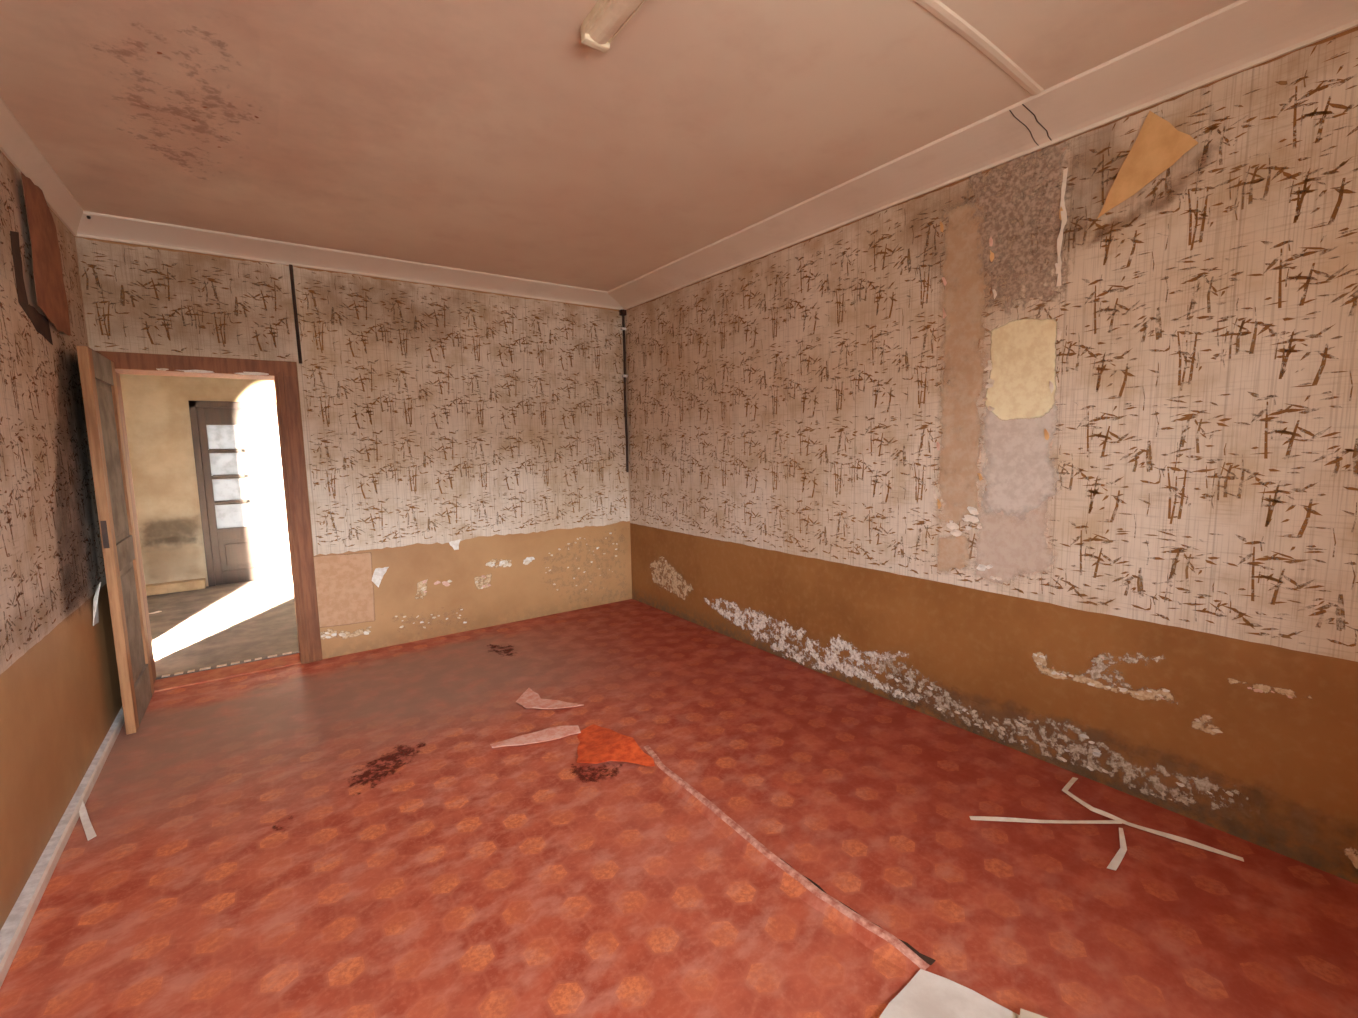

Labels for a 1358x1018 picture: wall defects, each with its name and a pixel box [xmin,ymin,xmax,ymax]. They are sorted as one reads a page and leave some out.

damp [57,357,97,608]
peeling [933,490,982,537]
peeling [372,567,389,588]
peeling [415,579,452,599]
peeling [474,533,617,595]
peeling [320,626,371,640]
damp [704,598,1248,810]
peeling [1344,848,1358,869]